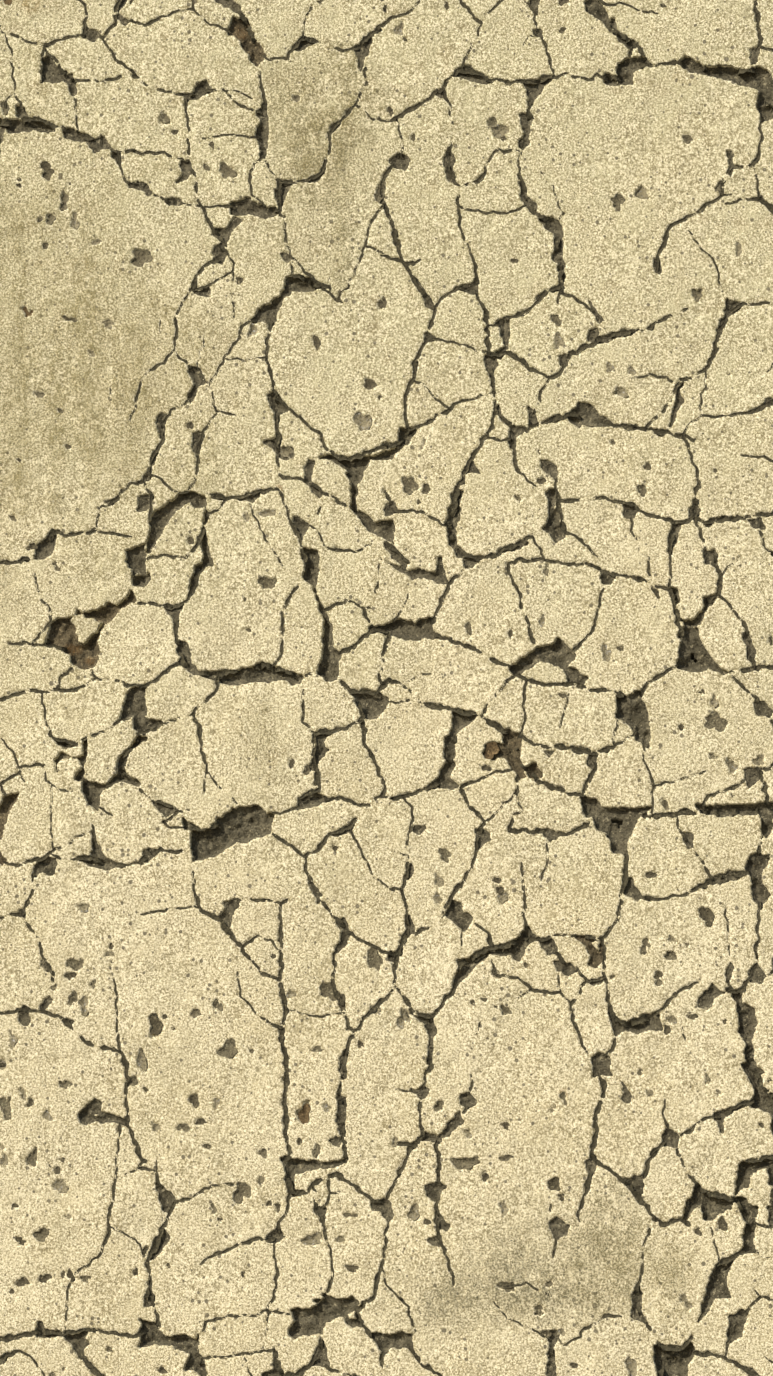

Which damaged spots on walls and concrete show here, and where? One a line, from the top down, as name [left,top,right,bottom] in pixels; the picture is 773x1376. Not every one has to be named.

crack [597,0,707,71]
crack [738,0,773,74]
crack [0,555,68,652]
crack [0,570,239,804]
crack [116,122,773,1161]
crack [0,738,234,1376]
crack [199,1047,456,1376]
crack [493,1047,773,1376]